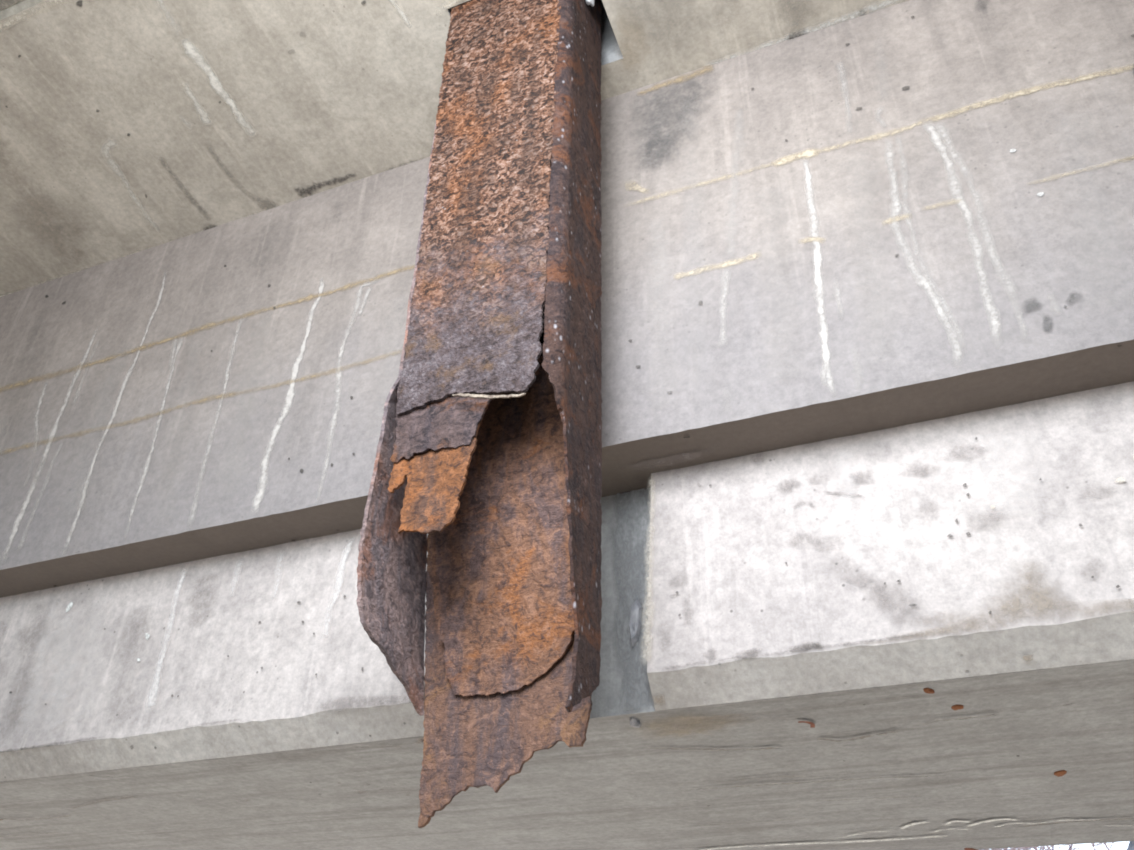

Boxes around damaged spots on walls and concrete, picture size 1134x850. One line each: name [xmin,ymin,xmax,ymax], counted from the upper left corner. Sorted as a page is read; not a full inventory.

damp [4,333,95,557]
damp [66,276,165,546]
damp [129,339,182,523]
damp [190,324,241,520]
damp [253,280,324,511]
damp [320,283,371,489]
corrosion [387,417,484,534]
peeling [390,355,575,697]
damp [804,162,840,390]
damp [887,143,961,359]
damp [926,125,1013,337]
damp [1017,301,1051,330]